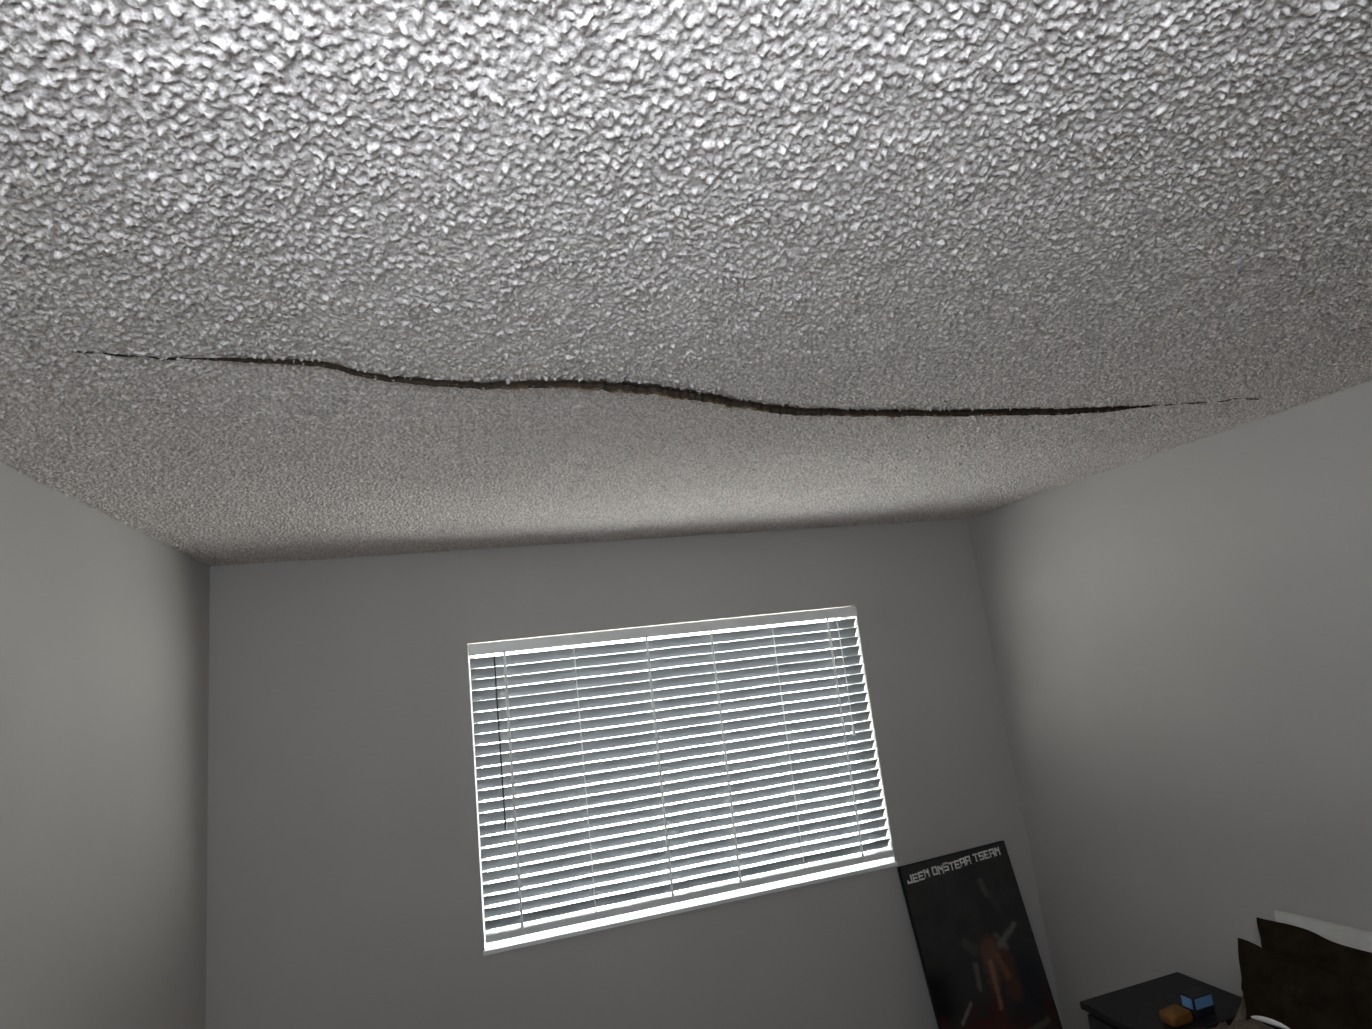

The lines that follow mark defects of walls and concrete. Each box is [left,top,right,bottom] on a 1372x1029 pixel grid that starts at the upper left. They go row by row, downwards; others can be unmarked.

crack [72,351,1259,418]